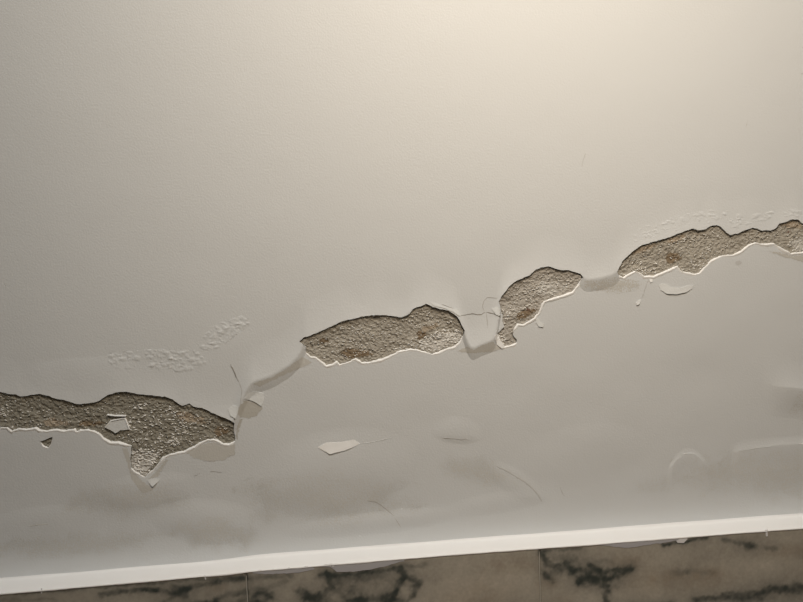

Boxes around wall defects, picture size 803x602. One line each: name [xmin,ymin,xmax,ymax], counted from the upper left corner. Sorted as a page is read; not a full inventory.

flaking render [617,220,803,294]
flaking render [300,301,464,368]
flaking render [492,266,582,349]
flaking render [0,392,238,487]
peeling [318,440,360,454]